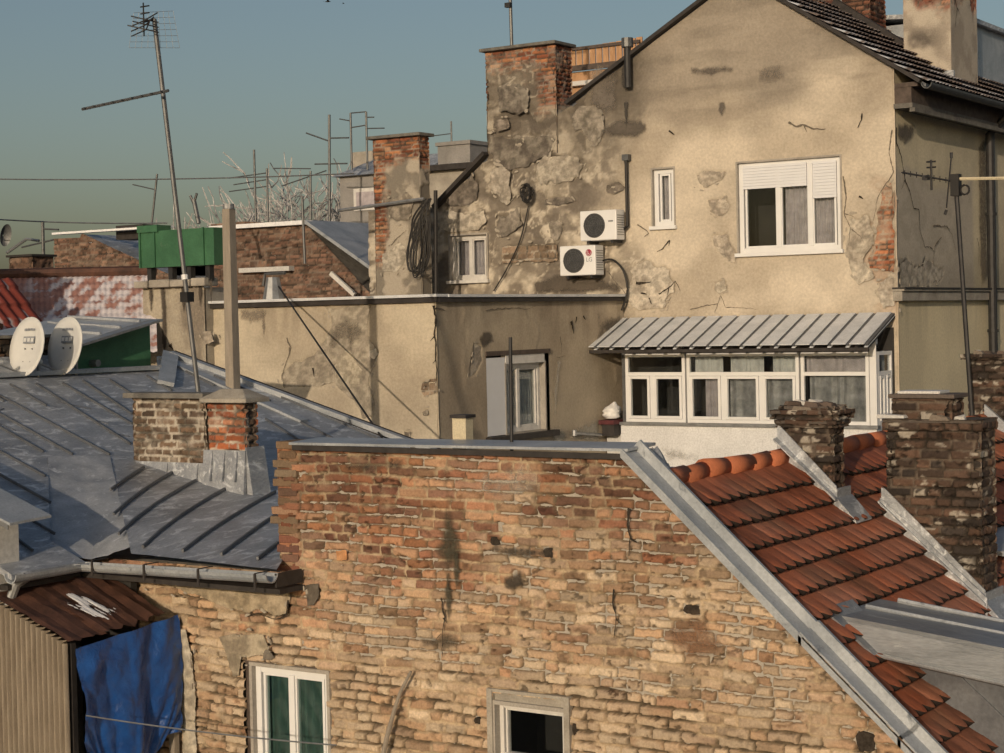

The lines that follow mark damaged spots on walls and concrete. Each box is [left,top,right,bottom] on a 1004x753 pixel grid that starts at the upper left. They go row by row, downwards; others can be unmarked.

flaking render [572,105,604,147]
flaking render [438,83,587,233]
flaking render [694,171,730,218]
flaking render [499,221,563,265]
flaking render [713,232,736,266]
flaking render [843,179,944,287]
flaking render [626,258,678,313]
flaking render [277,304,378,419]
crack [429,305,437,383]